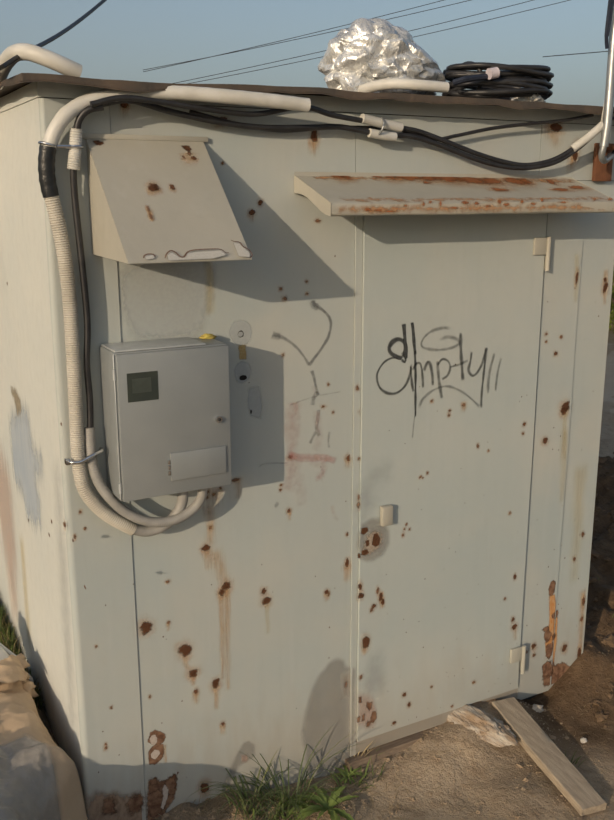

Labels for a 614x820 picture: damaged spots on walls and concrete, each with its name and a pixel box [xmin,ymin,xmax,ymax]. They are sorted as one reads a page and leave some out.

rust [316,176,612,212]
peeling [165,240,253,260]
rust [345,527,380,567]
rust [179,644,192,657]
rust [526,580,570,686]
rust [357,697,377,727]
rust [148,730,166,765]
rust [87,772,179,820]